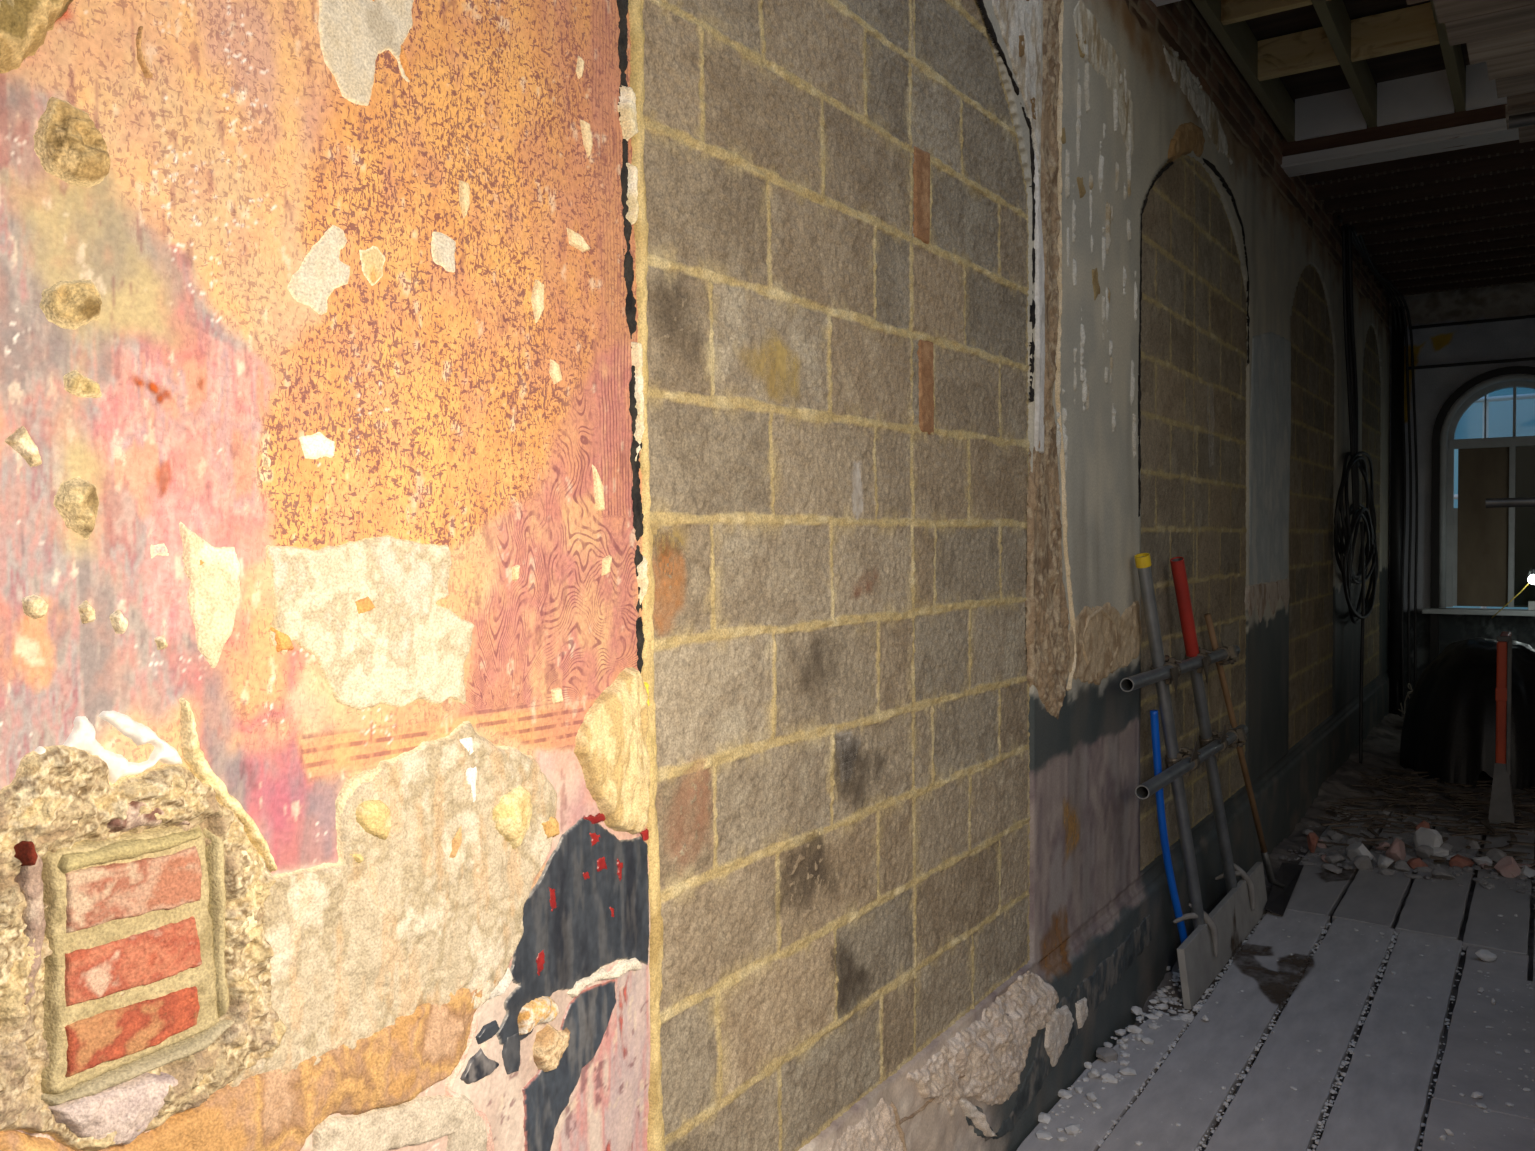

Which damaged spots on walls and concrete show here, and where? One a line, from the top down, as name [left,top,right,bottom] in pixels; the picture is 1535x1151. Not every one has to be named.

peeling [317,0,414,106]
peeling [992,0,1043,177]
peeling [287,225,385,315]
peeling [1056,0,1138,472]
spalling [0,522,649,1151]
flaking render [907,914,1152,1141]
flaking render [824,1098,903,1151]